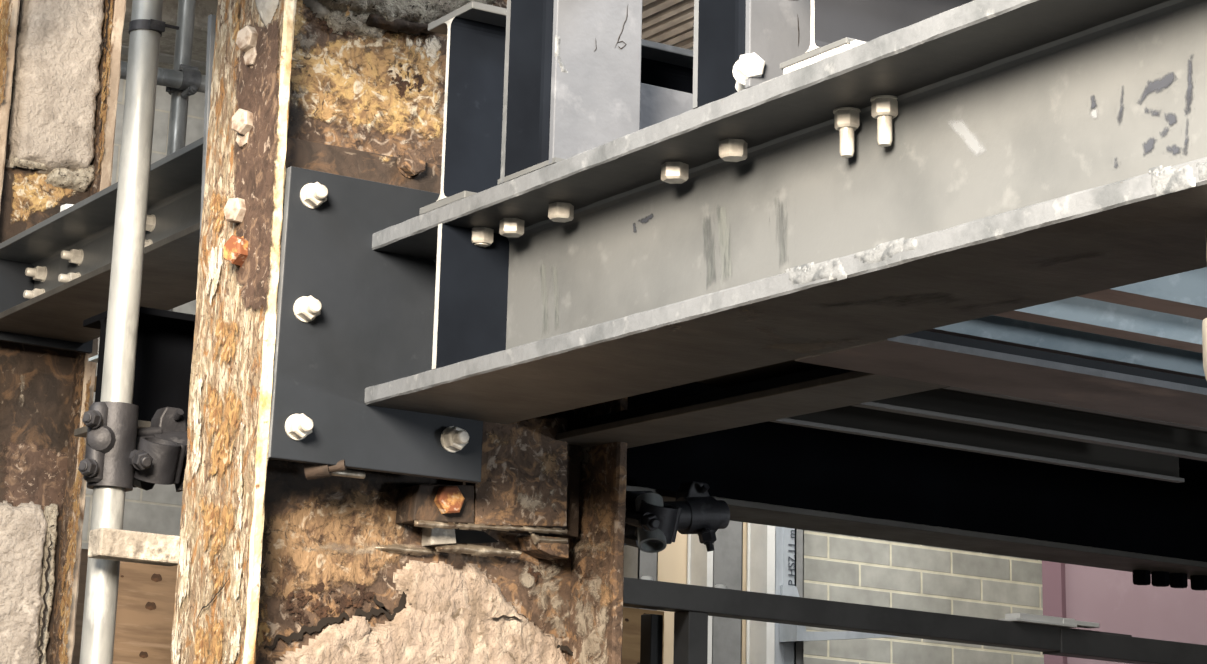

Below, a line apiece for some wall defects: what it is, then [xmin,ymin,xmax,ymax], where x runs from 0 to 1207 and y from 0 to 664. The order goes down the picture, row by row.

rust [210,0,443,311]
peeling [1149,162,1207,197]
peeling [206,238,225,305]
peeling [786,237,917,285]
rust [212,314,238,367]
peeling [192,378,203,477]
peeling [171,534,191,664]
peeling [224,621,241,664]
peeling [233,550,243,600]
crack [264,591,407,649]
spalling [275,554,568,664]
crack [492,607,573,656]